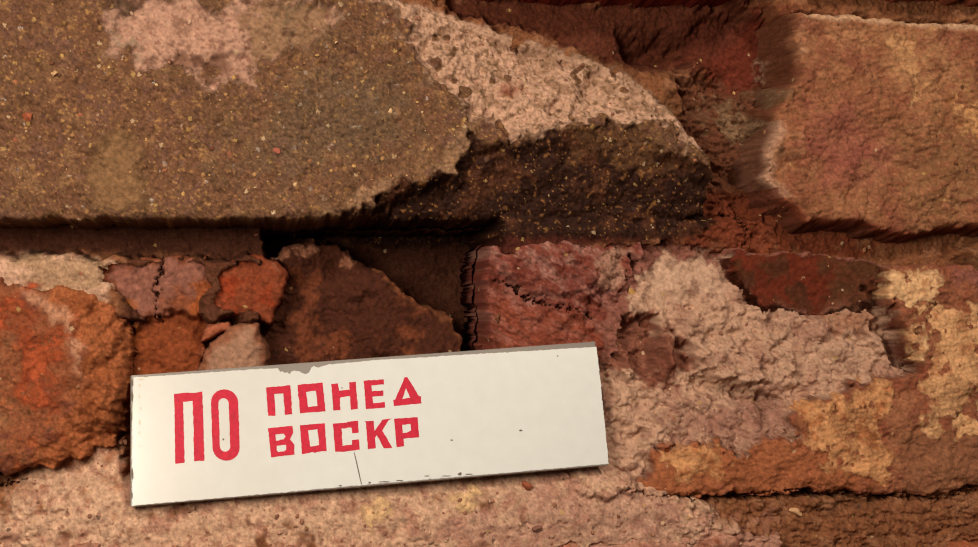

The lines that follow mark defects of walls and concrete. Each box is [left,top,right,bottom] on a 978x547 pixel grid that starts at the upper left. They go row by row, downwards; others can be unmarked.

spalling [598,248,978,487]